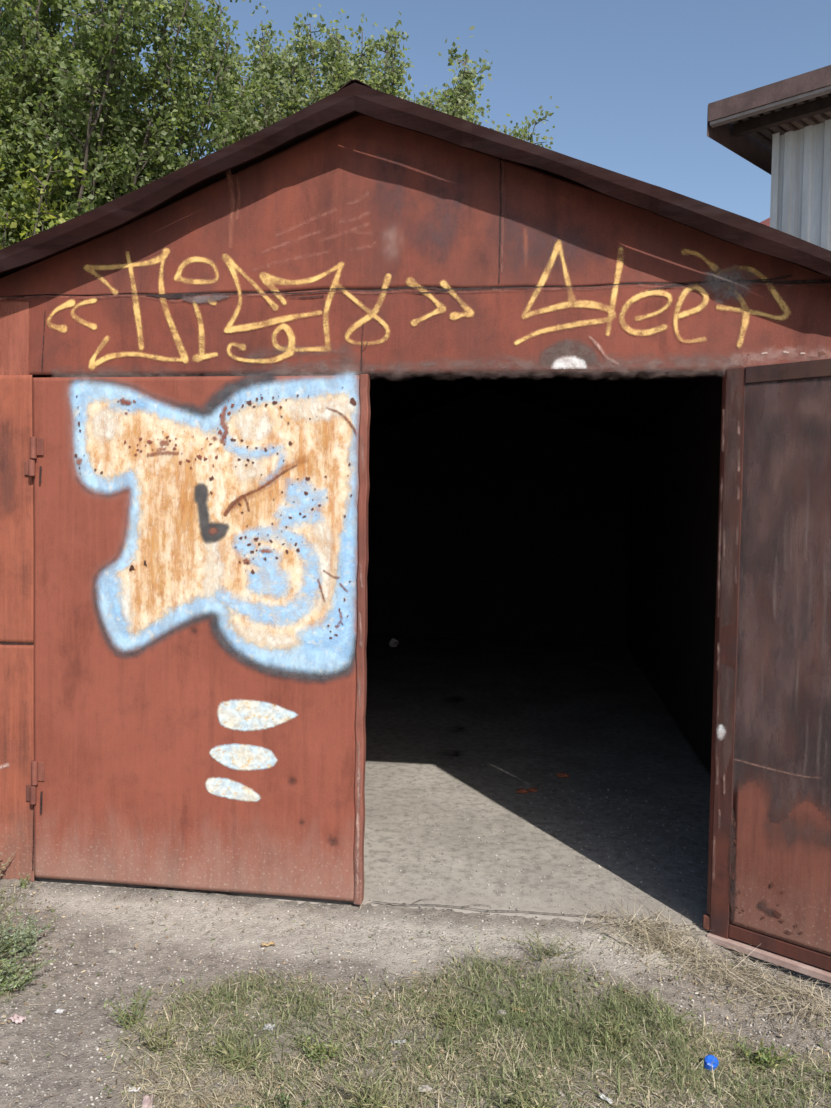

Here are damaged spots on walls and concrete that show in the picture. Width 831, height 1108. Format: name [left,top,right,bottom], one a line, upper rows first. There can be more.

rust [93,413,223,609]
rust [209,409,343,552]